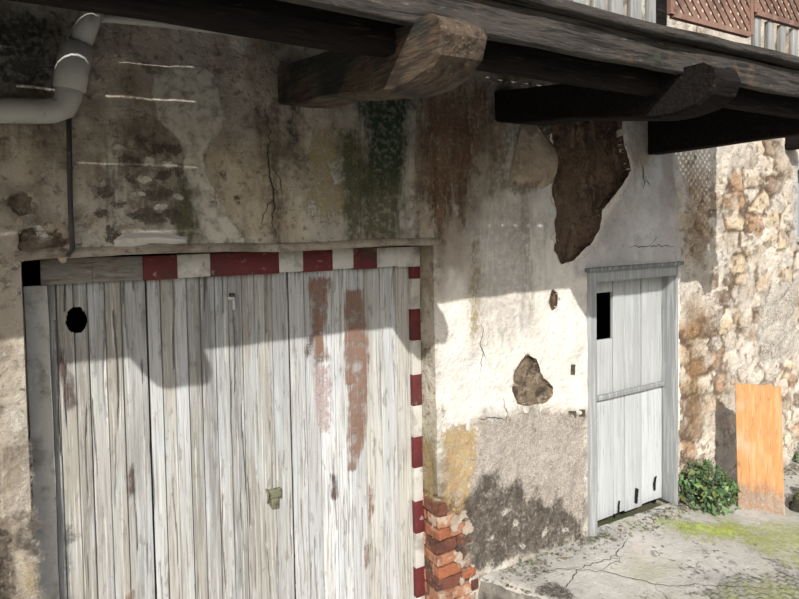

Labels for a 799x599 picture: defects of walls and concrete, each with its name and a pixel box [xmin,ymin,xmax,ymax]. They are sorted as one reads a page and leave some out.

spalling [4,191,69,262]
crack [261,109,282,243]
leakage [309,99,409,247]
spalling [538,121,631,265]
peeling [422,351,586,599]
leakage [457,474,584,570]
crack [520,538,782,599]